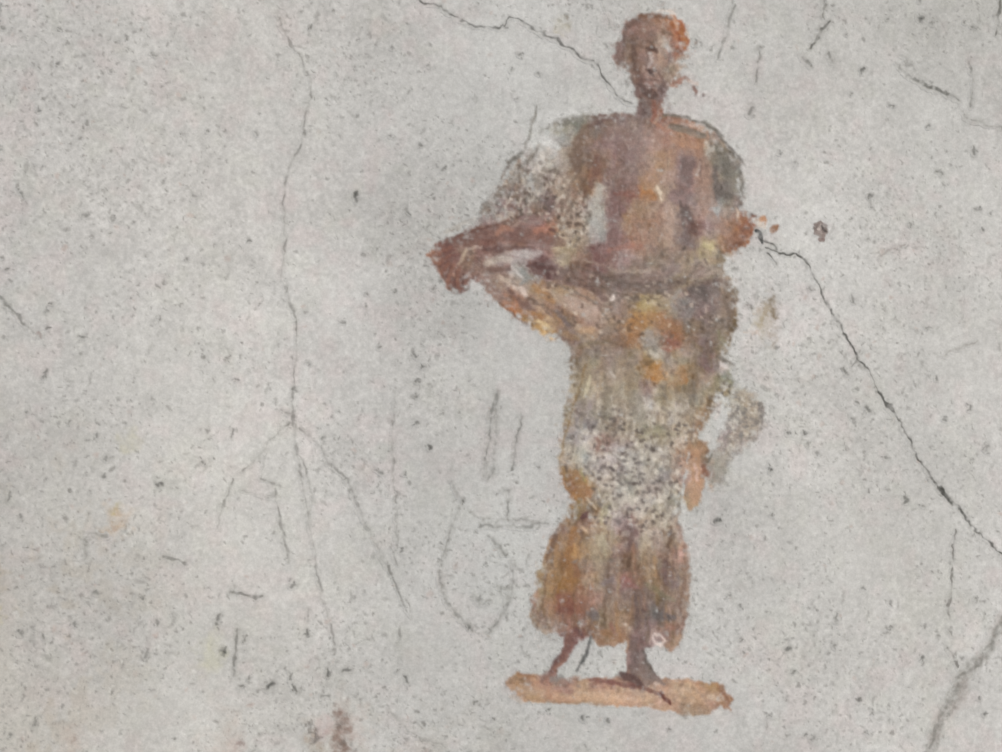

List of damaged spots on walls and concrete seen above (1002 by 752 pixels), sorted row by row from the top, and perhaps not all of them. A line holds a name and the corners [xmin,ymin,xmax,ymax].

crack [417,0,635,107]
crack [752,225,1002,752]